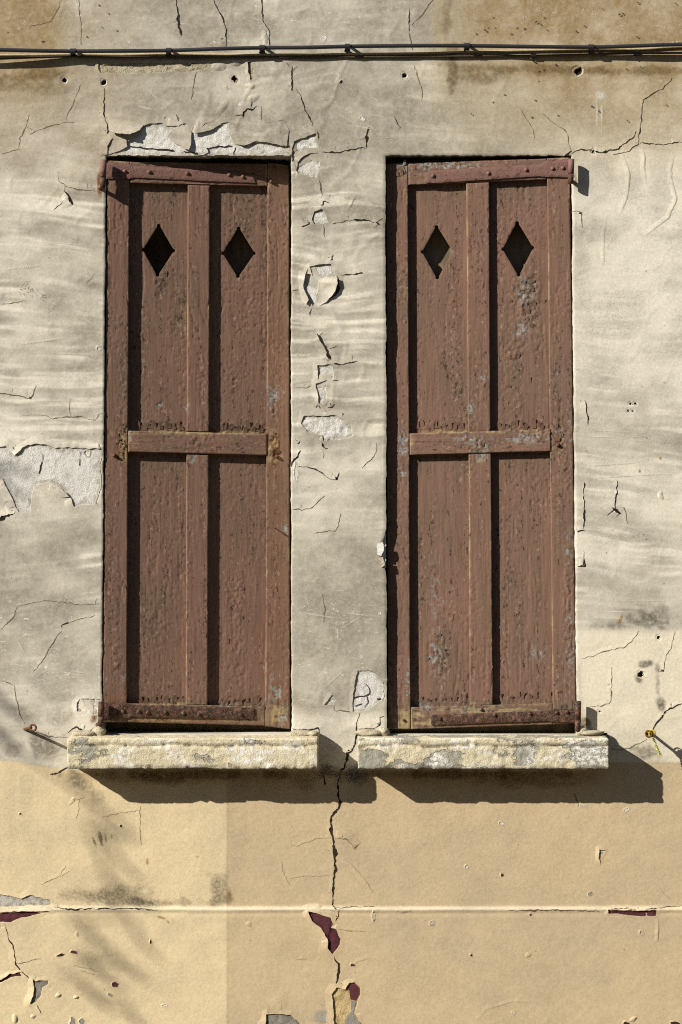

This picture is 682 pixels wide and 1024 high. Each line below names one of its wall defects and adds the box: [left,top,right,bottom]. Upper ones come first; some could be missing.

peeling [99,114,327,184]
crack [521,77,682,156]
peeling [296,360,357,446]
peeling [0,435,103,521]
crack [0,597,100,738]
peeling [322,667,386,715]
crack [650,699,682,730]
crack [279,706,384,932]
peeling [0,888,58,927]
peeling [603,904,661,936]
peeling [302,903,367,1024]
crack [331,957,340,984]